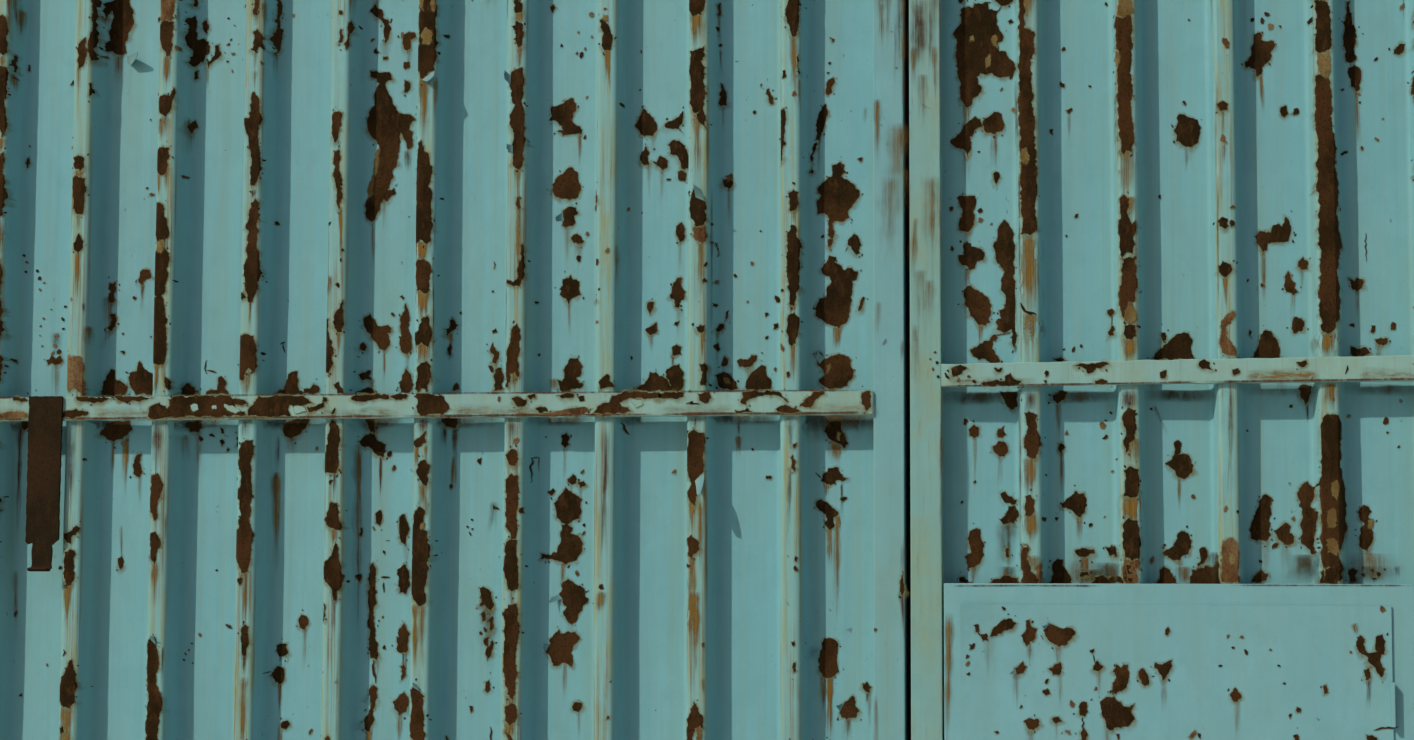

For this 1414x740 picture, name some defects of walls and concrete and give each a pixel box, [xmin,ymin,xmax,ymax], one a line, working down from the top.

rust [881,0,1414,587]
rust [39,0,871,740]
rust [945,622,970,705]
rust [1020,705,1041,733]
rust [987,606,1075,676]
rust [1065,660,1172,734]
rust [1349,624,1388,683]